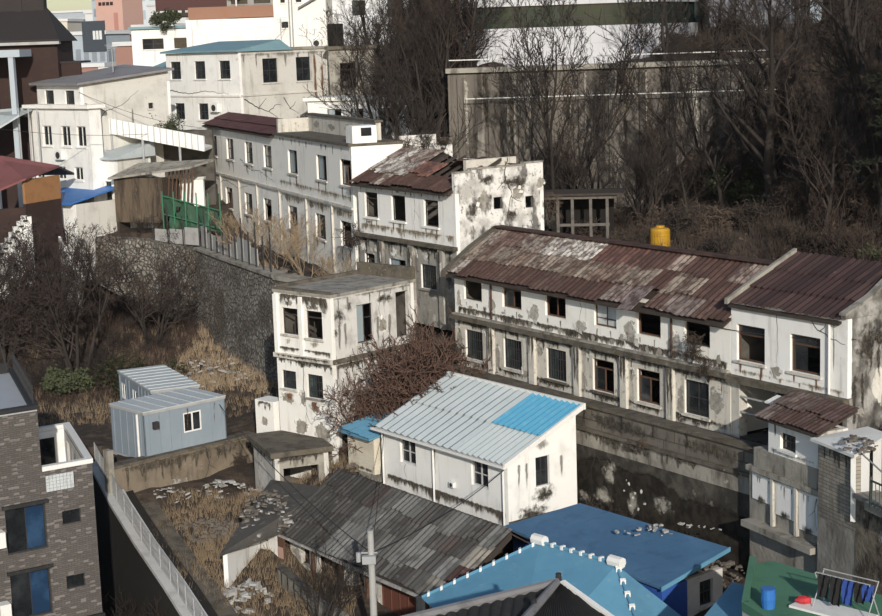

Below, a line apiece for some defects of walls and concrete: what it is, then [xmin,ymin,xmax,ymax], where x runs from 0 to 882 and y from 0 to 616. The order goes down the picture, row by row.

peeling [280,294,327,318]
damp [335,297,351,348]
damp [362,285,406,302]
spalling [457,290,726,370]
damp [278,340,381,378]
damp [852,325,882,424]
peeling [675,382,684,420]
peeling [280,390,348,465]
damp [388,474,503,525]
spalling [628,493,638,514]
spalling [654,497,670,514]